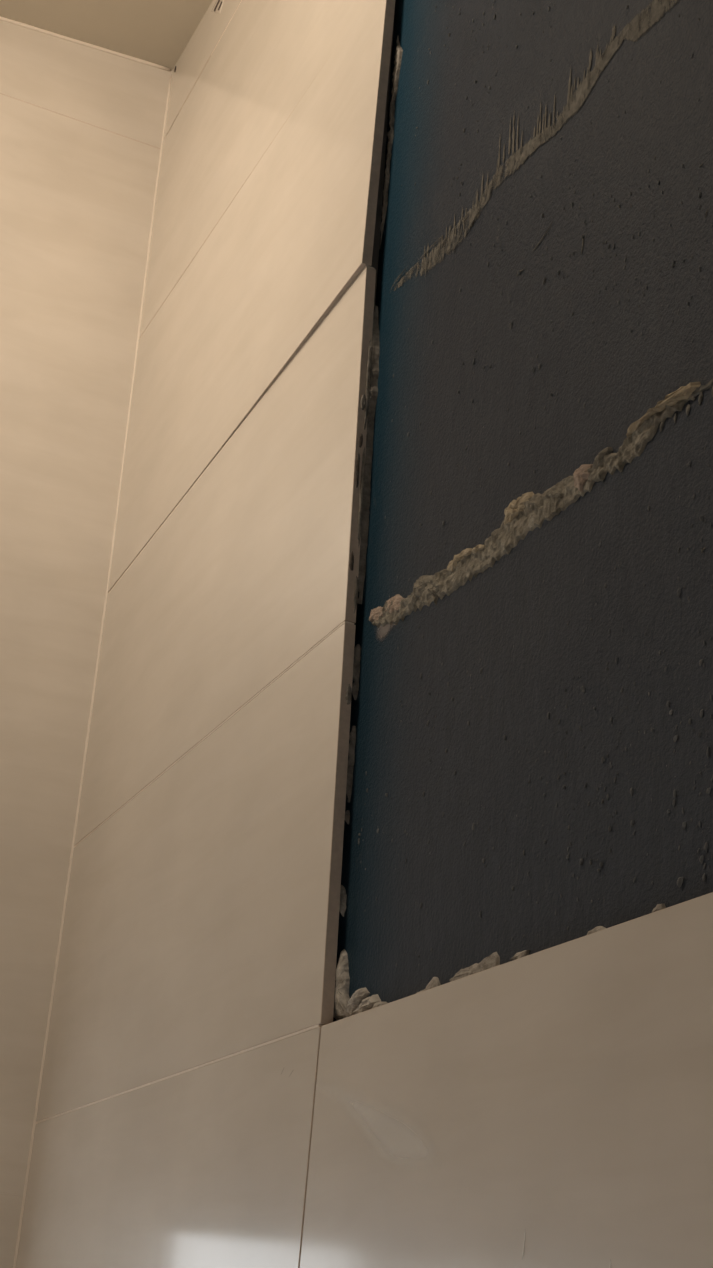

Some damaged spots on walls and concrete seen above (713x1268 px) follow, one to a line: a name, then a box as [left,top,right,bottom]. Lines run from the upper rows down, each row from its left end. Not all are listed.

peeling [333,0,713,1022]